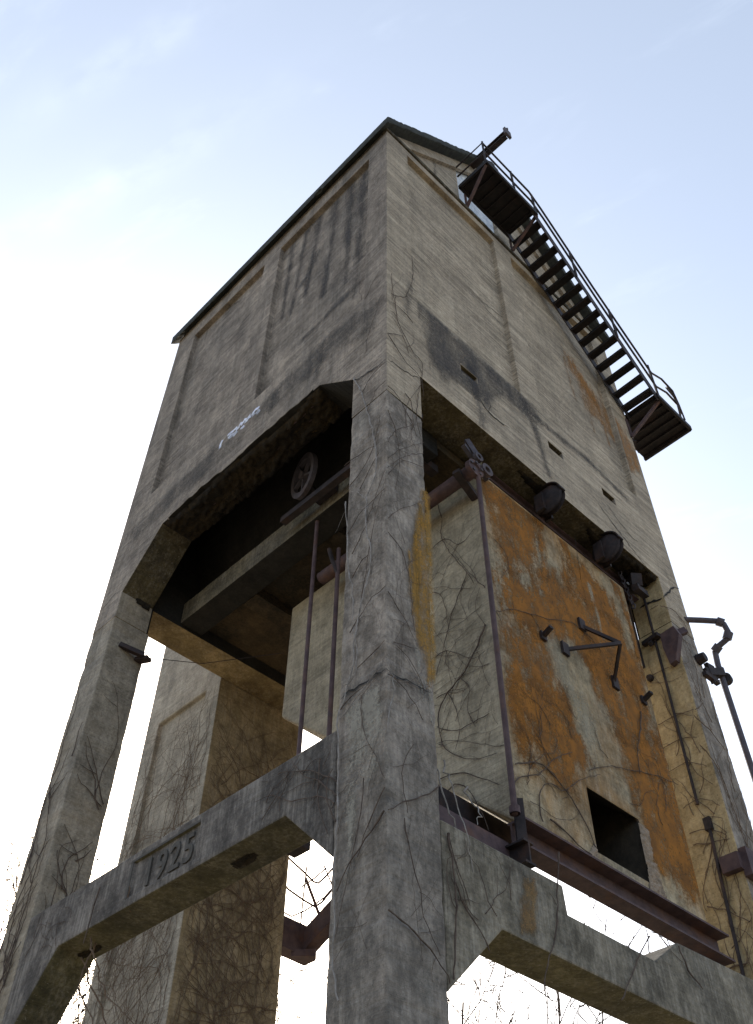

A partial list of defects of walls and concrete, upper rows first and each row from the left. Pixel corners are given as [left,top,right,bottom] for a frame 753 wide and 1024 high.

leakage [281,174,367,317]
leakage [407,288,626,498]
corrosion [408,491,436,682]
corrosion [481,479,701,903]